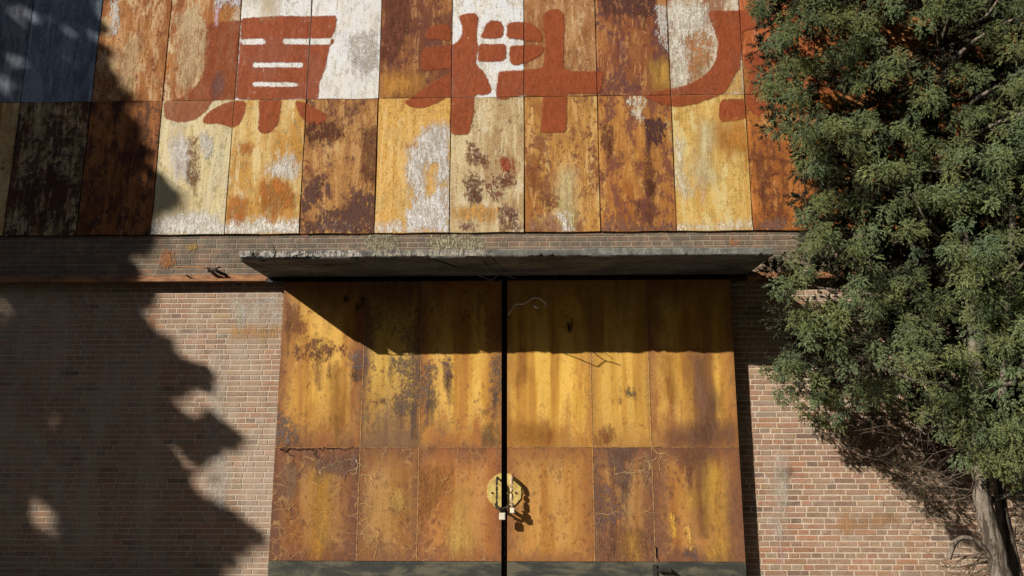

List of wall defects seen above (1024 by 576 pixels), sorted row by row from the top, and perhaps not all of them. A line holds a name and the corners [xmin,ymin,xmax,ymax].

rust [601,0,658,25]
rust [683,29,715,74]
rust [727,69,742,93]
rust [185,137,201,188]
rust [299,126,377,233]
peeling [376,122,450,233]
rust [452,142,561,232]
rust [600,124,615,153]
rust [635,116,667,223]
rust [375,353,453,435]
crack [275,444,454,560]
crack [599,444,680,526]